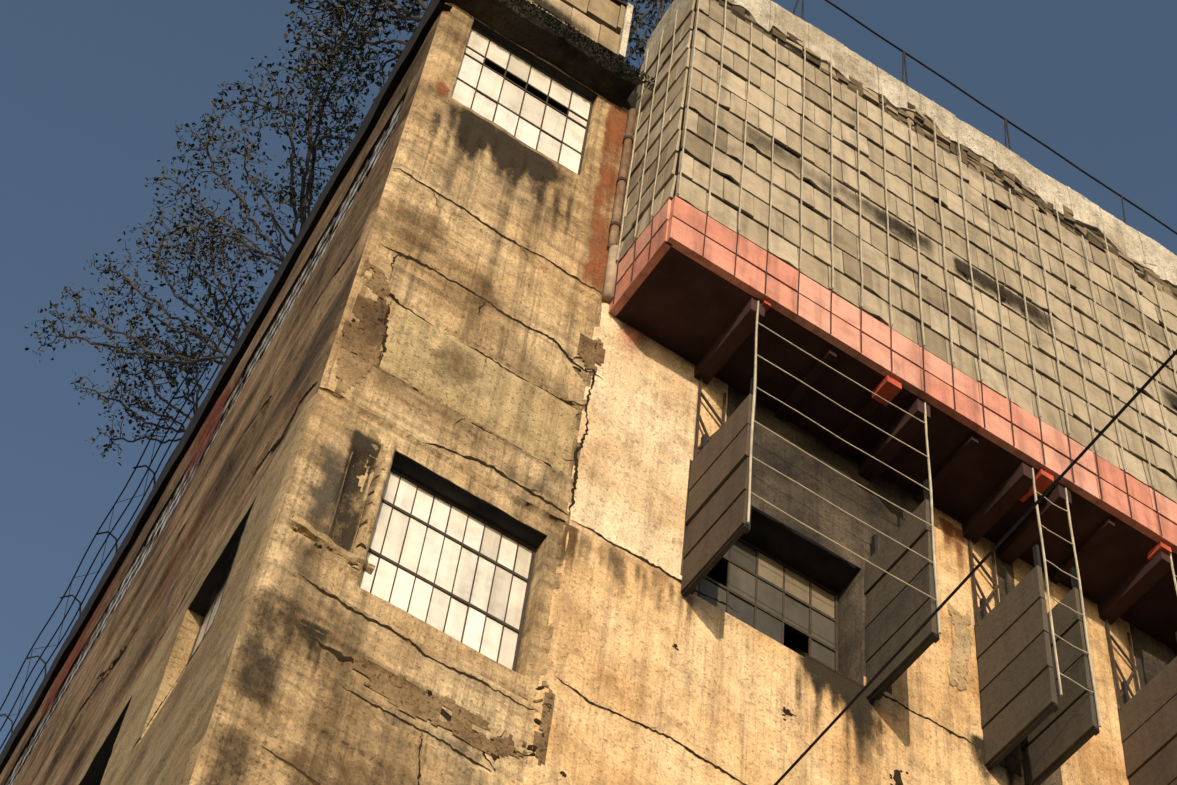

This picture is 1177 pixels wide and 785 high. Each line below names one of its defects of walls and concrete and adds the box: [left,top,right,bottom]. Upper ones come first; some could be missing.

leakage [432,107,572,214]
crack [394,168,602,294]
spalling [333,260,391,397]
crack [311,230,739,613]
spalling [289,428,387,575]
leakage [239,591,328,704]
crack [262,746,320,785]
crack [298,574,538,711]
crack [318,642,530,785]
spalling [352,656,555,771]
crack [555,676,747,785]
leakage [796,654,882,751]